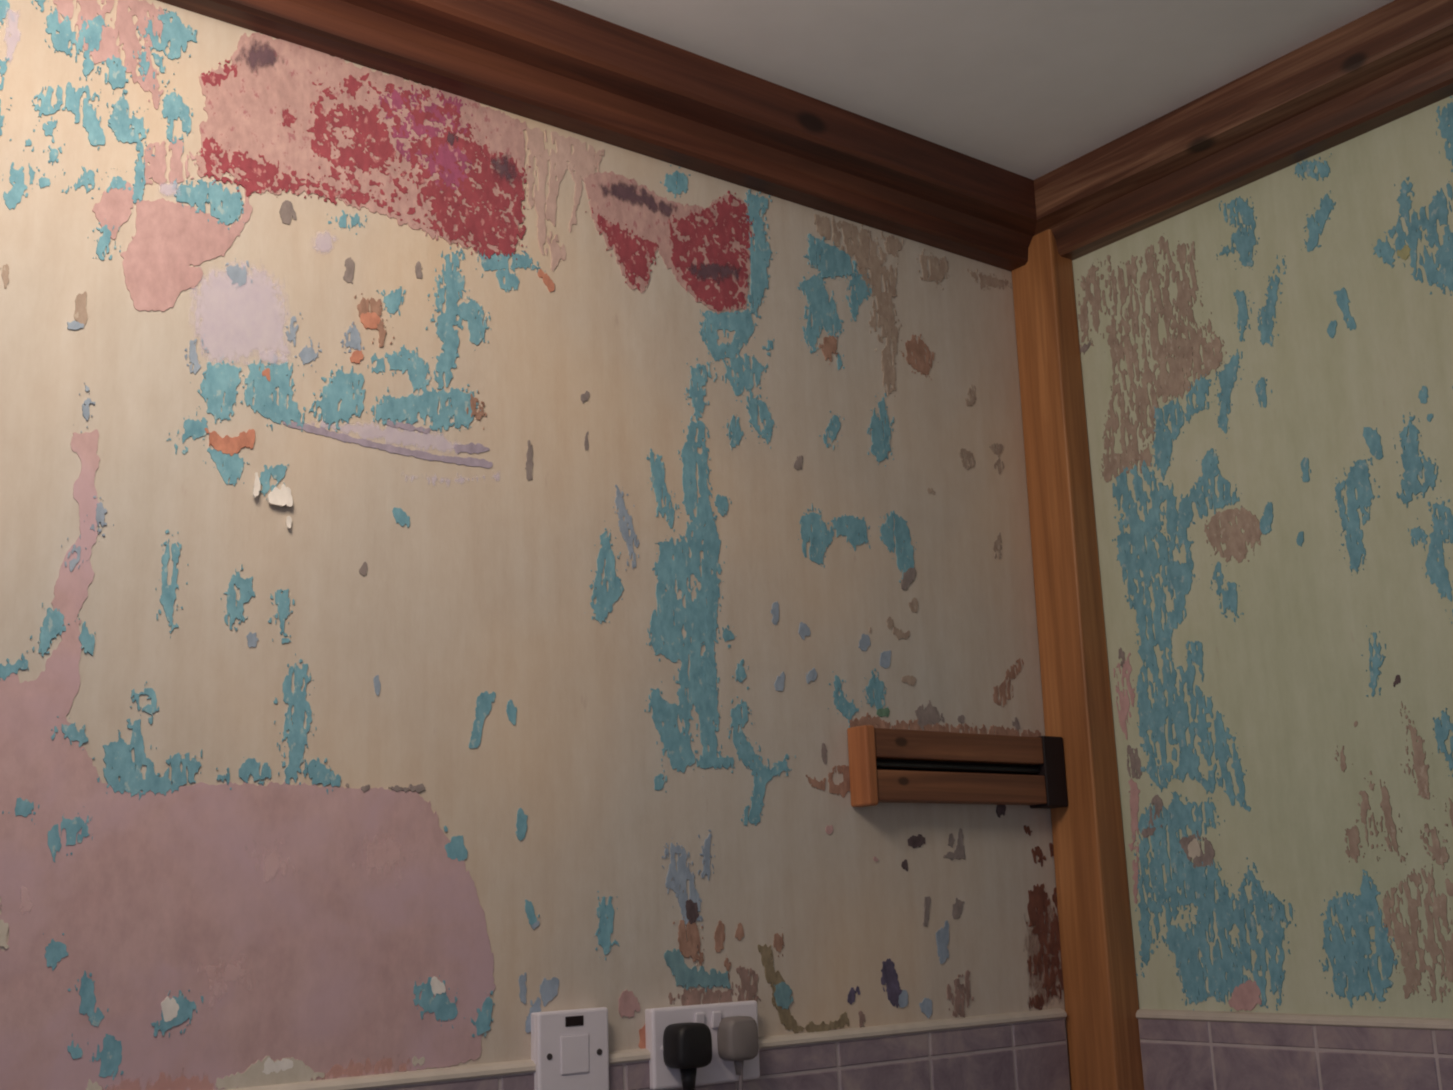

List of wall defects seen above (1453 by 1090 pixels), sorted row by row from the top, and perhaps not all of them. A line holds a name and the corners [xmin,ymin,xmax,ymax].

peeling [1373,96,1453,296]
flaking render [0,383,496,1090]
peeling [166,246,555,529]
peeling [469,691,517,749]
peeling [589,189,850,826]
peeling [797,505,918,613]
flaking render [797,209,949,467]
peeling [1077,196,1296,1012]
flaking render [1319,625,1453,1008]
peeling [1335,386,1453,624]
peeling [758,927,865,1033]
peeling [881,958,974,1018]